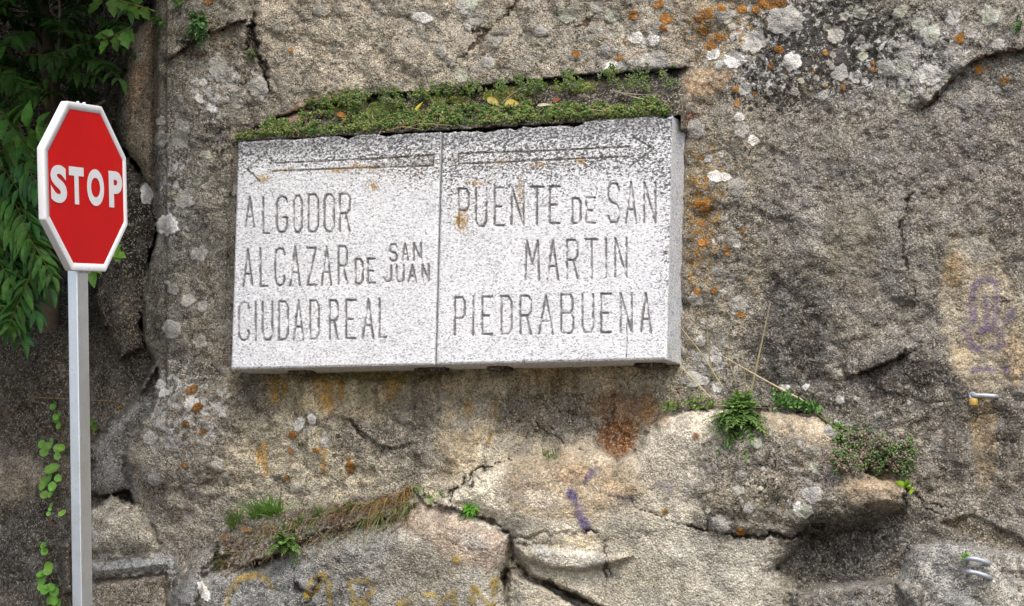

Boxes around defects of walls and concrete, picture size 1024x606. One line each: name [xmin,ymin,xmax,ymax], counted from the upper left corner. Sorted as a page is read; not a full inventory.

crack [170,12,270,92]
crack [920,48,1024,111]
crack [341,418,365,439]
corrosion [599,391,637,457]
crack [419,458,511,508]
crack [501,538,612,606]